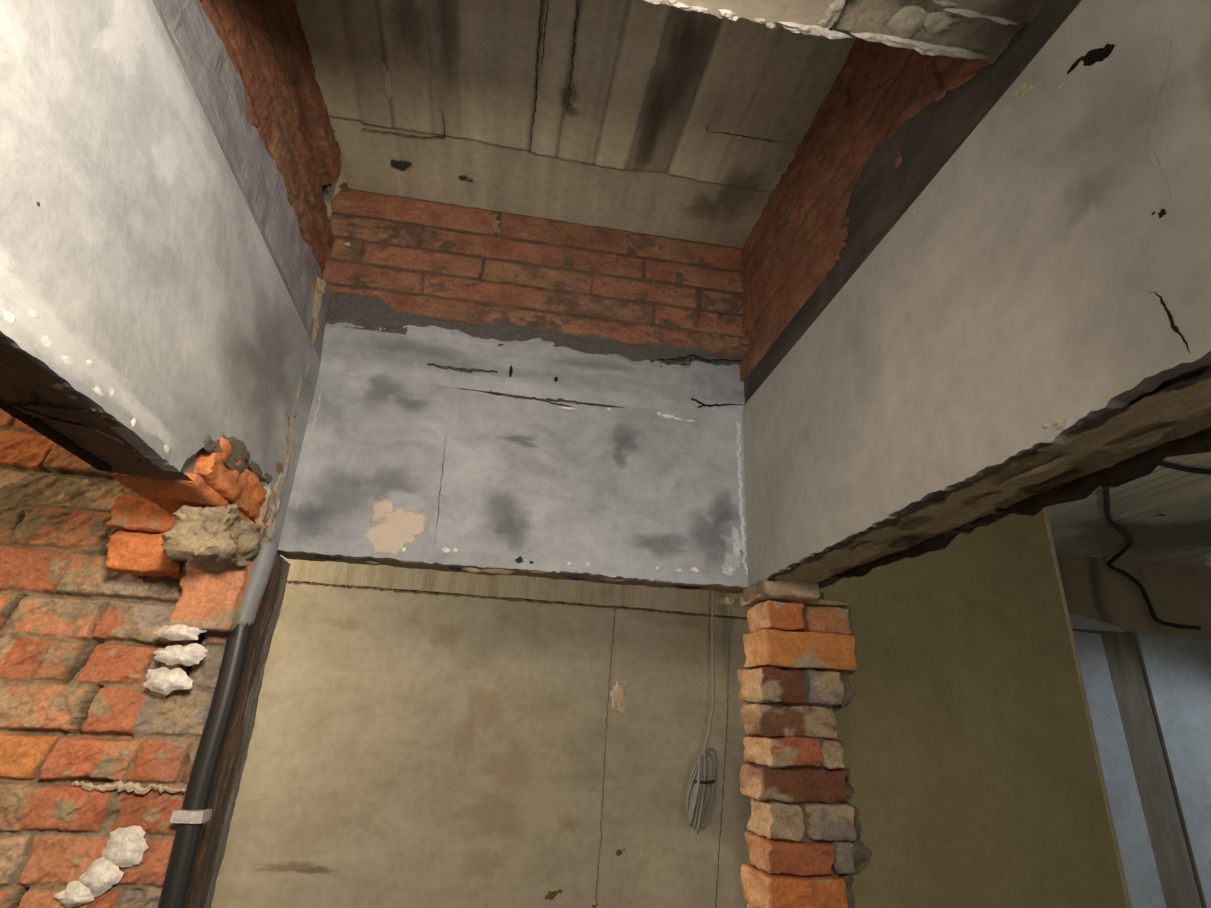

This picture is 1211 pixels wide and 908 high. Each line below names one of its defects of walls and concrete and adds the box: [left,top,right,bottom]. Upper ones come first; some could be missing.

spalling [644,0,739,22]
spalling [754,0,1022,60]
crack [1149,292,1190,353]
flaking render [203,434,290,539]
damp [366,496,426,555]